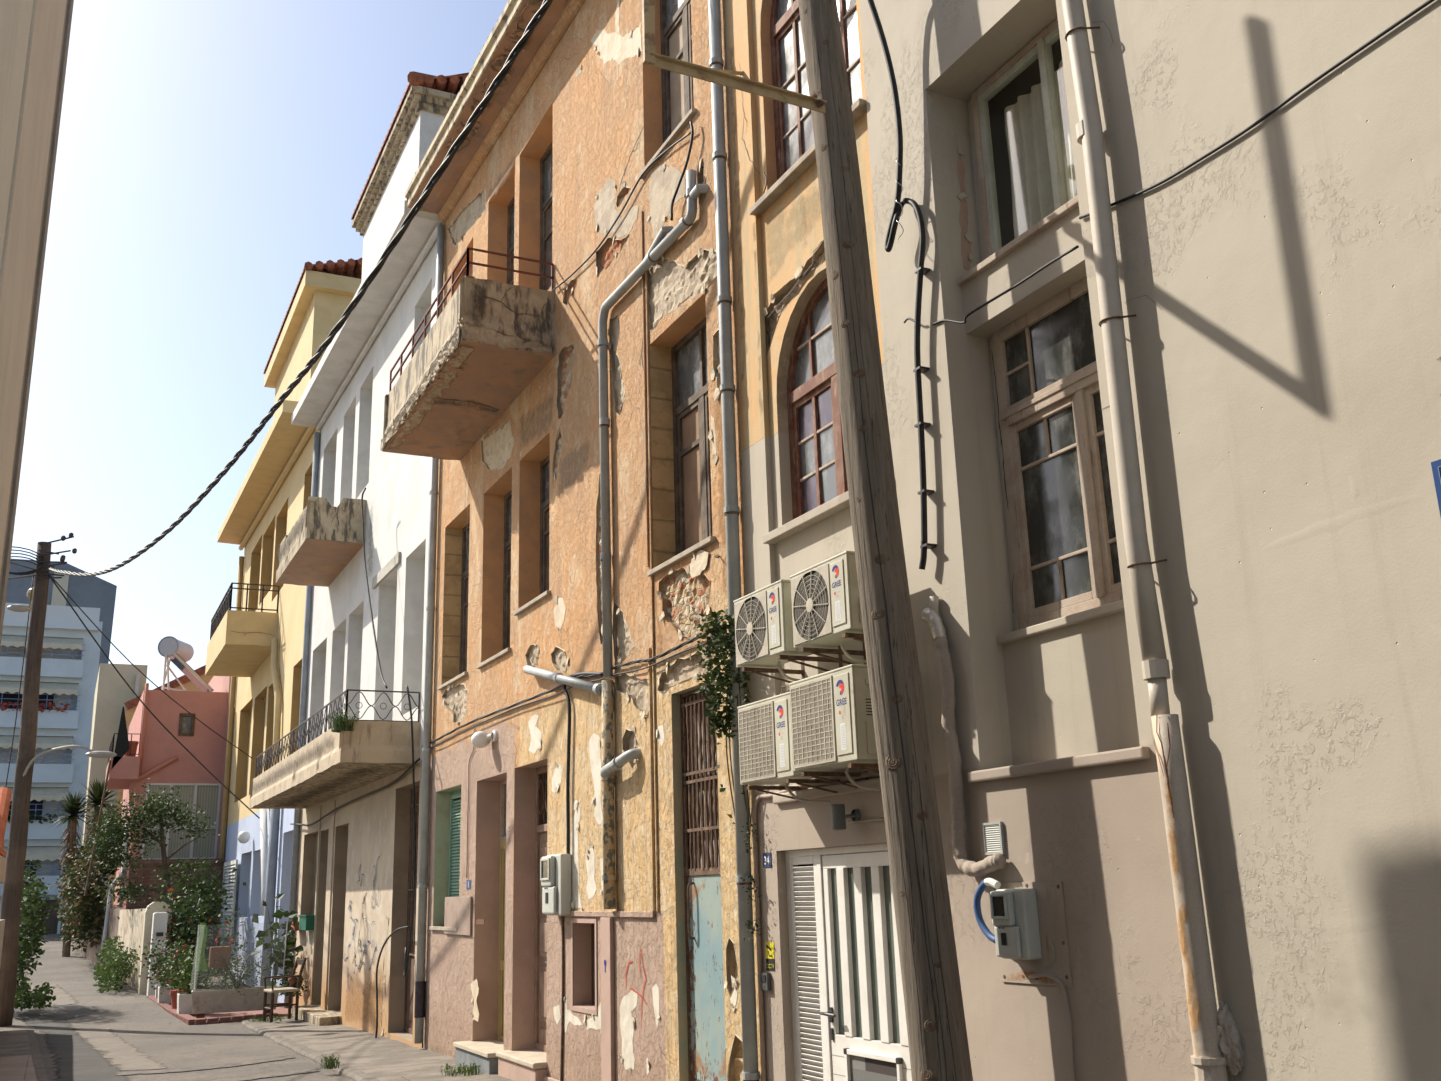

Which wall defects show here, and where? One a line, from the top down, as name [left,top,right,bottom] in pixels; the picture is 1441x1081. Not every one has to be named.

peeling [591,0,642,65]
spalling [594,157,717,332]
spalling [763,242,825,356]
spalling [380,319,576,481]
spalling [596,475,713,768]
peeling [553,997,601,1033]
peeling [619,984,660,1075]
spalling [724,937,738,1012]
spalling [724,1034,743,1081]
corrosion [1178,906,1199,1030]